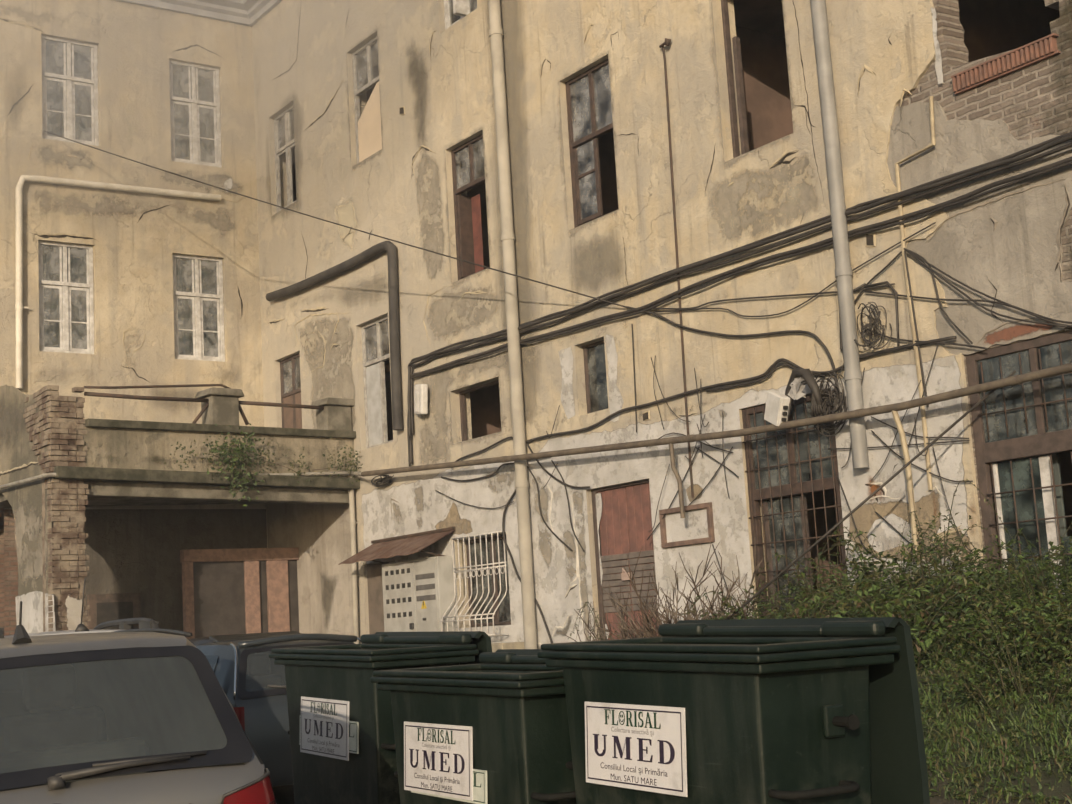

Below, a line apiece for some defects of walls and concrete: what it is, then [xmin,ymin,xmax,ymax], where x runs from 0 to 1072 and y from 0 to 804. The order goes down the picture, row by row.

crack [173,44,221,57]
crack [6,83,34,117]
crack [303,79,344,132]
leakage [409,53,425,137]
crack [770,2,827,224]
flaking render [974,316,1063,349]
flaking render [415,487,423,527]
flaking render [435,503,472,534]
flaking render [533,477,603,649]
peeling [855,514,964,603]